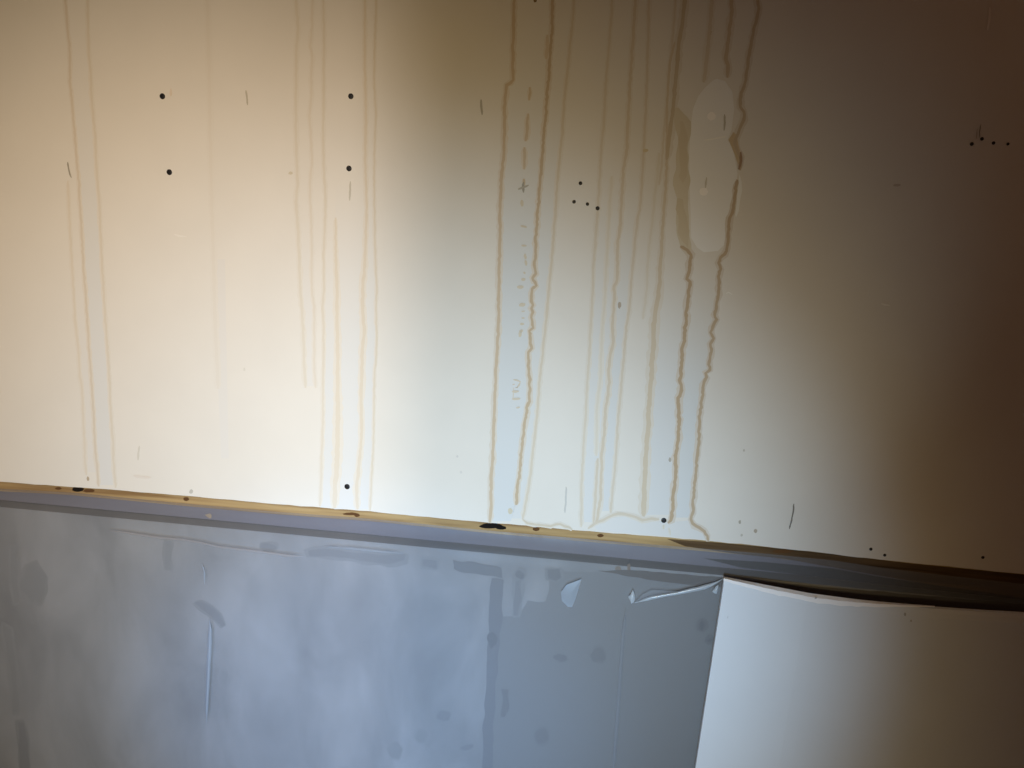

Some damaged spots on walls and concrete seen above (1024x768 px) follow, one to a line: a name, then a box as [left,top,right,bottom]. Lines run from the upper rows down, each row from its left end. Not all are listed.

water stain [62,0,118,488]
water stain [292,0,379,511]
water stain [487,0,763,542]